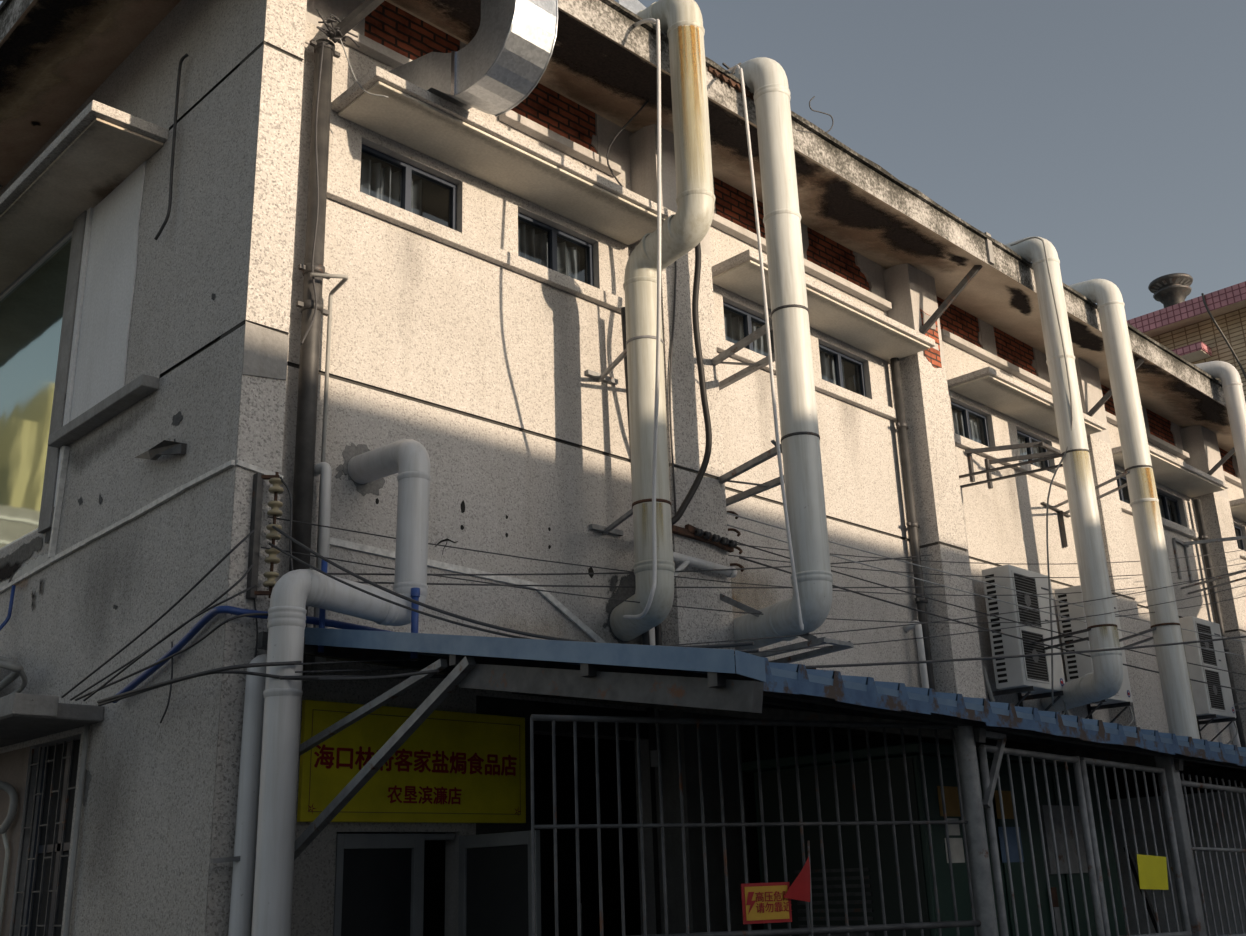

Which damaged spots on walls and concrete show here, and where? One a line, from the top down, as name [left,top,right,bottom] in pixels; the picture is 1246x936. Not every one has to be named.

leakage [0,0,121,120]
flaking render [364,1,460,60]
leakage [428,0,481,40]
flaking render [511,83,597,153]
leakage [708,100,761,174]
flaking render [714,177,766,239]
leakage [794,151,968,266]
flaking render [801,223,883,298]
flaking render [920,297,1037,376]
peeling [0,529,51,581]